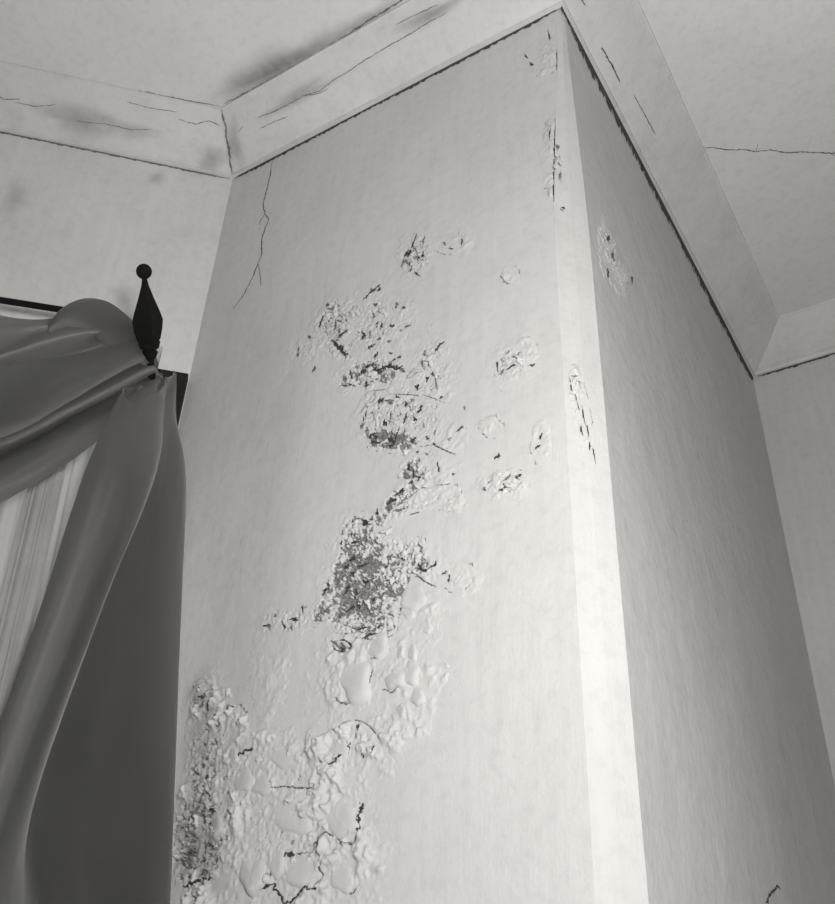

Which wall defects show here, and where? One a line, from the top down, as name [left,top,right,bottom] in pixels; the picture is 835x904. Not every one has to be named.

crack [0,0,835,380]
peeling [539,110,565,210]
peeling [484,332,540,393]
peeling [475,453,531,503]
peeling [530,416,552,468]
spalling [171,220,506,904]